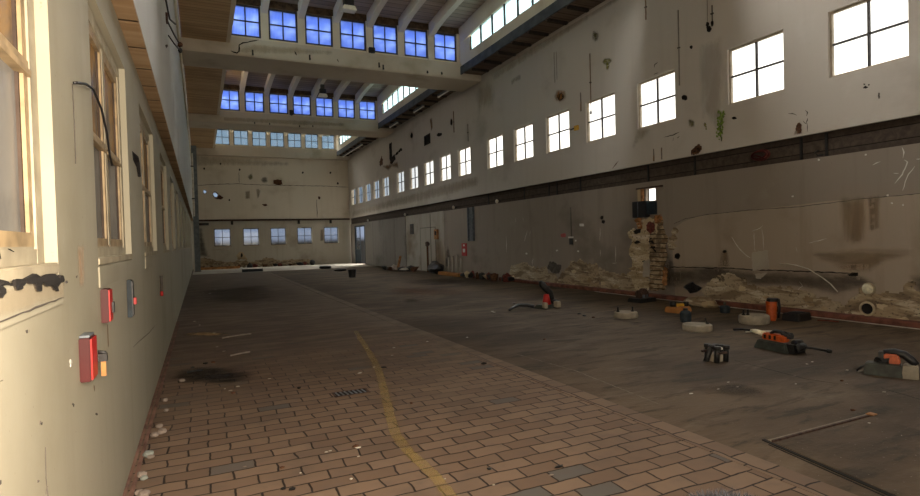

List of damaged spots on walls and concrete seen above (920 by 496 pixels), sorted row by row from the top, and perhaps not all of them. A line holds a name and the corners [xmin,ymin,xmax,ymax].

spalling [509,214,669,291]
spalling [702,250,920,321]